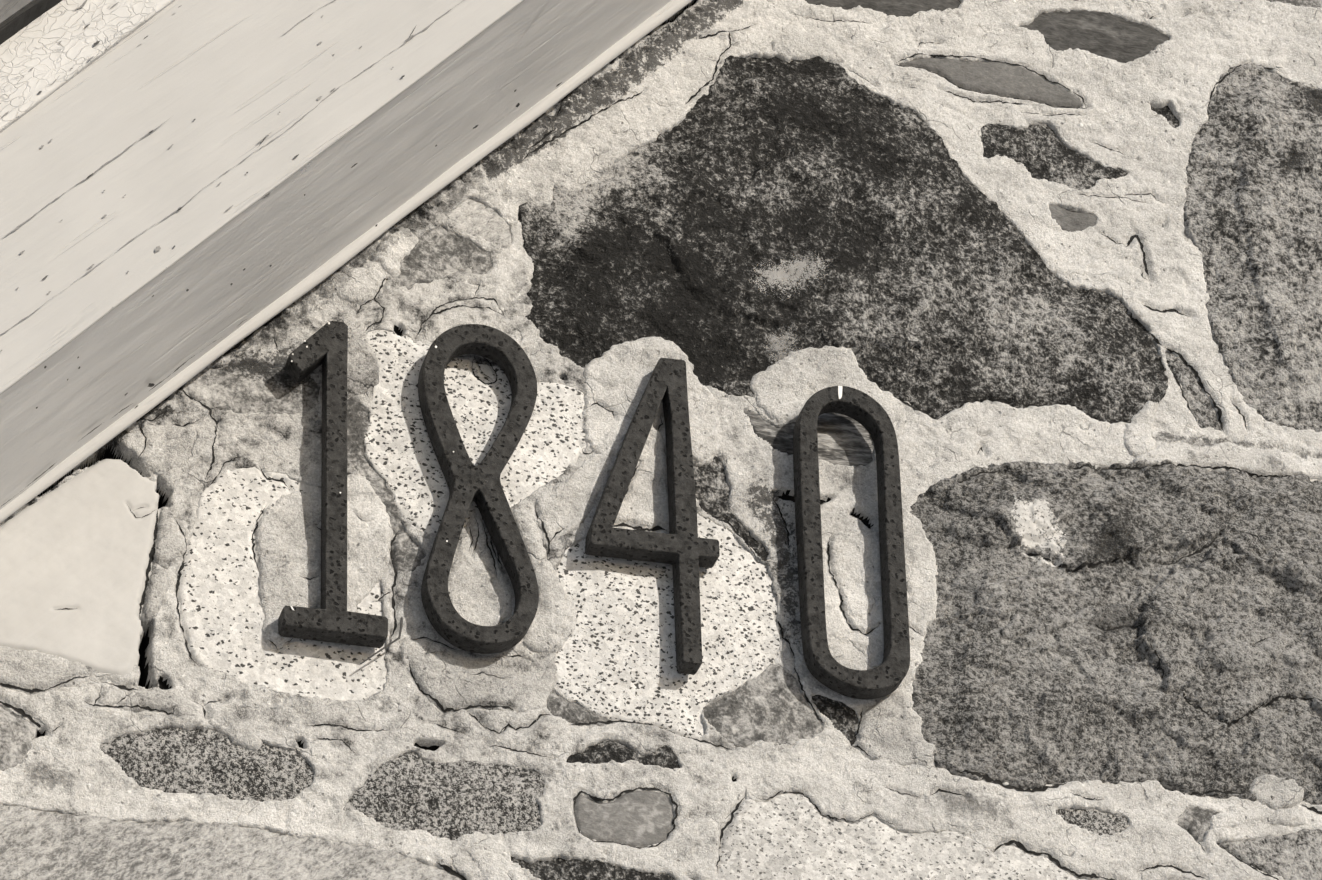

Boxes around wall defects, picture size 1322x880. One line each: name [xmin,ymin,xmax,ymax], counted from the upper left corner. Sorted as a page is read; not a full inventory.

crack [0,0,464,335]
crack [128,506,196,663]
crack [0,676,221,737]
crack [993,835,1279,880]